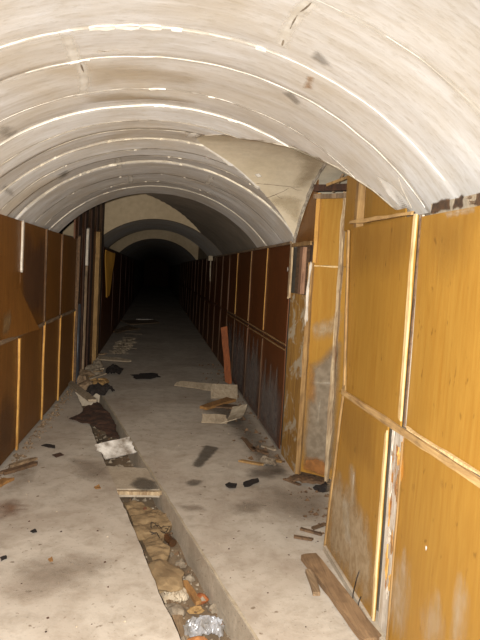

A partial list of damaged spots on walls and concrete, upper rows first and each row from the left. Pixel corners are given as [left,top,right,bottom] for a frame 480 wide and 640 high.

crack [279,0,315,46]
leakage [228,329,278,436]
leakage [305,352,337,465]
leakage [330,471,369,590]